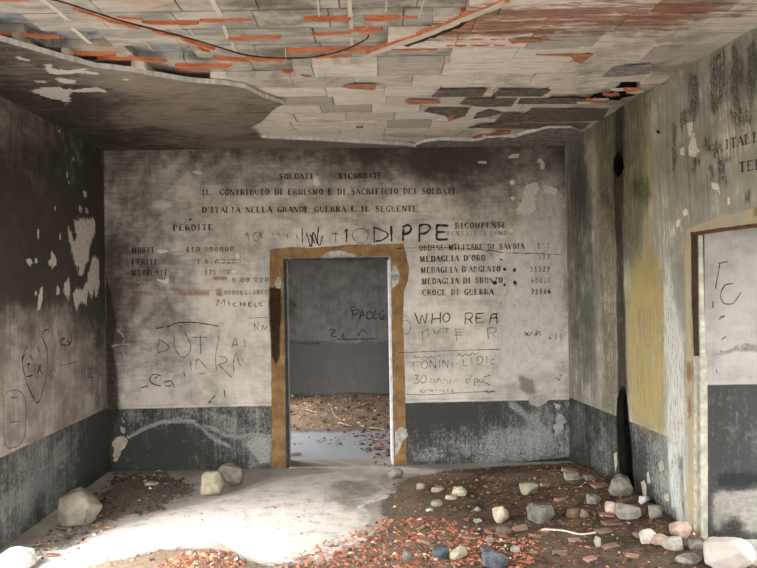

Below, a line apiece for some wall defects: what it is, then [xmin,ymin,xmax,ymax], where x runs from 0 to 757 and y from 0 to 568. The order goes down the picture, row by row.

spalling [364,0,510,58]
peeling [30,64,109,104]
peeling [536,54,593,64]
peeling [710,43,757,126]
peeling [672,76,731,205]
peeling [511,181,558,217]
peeling [56,205,100,310]
peeling [111,418,130,461]